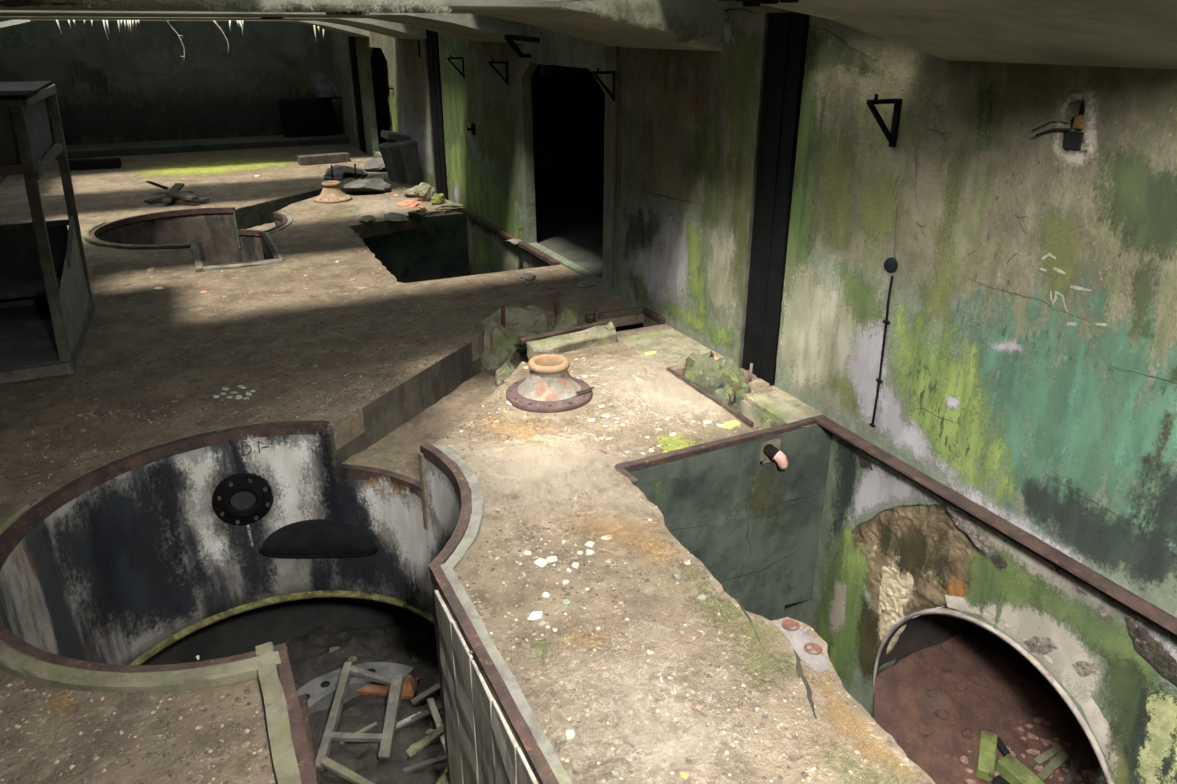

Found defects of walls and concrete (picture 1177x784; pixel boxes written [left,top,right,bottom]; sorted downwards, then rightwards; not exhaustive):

damp [703,214,738,332]
damp [777,80,889,428]
damp [44,462,209,639]
damp [213,440,265,486]
damp [230,491,256,510]
damp [221,513,277,595]
damp [311,433,425,612]
spalling [629,400,833,621]
flaking render [829,582,847,634]
damp [831,438,914,684]
corrosion [880,520,966,598]
damp [947,338,1177,590]